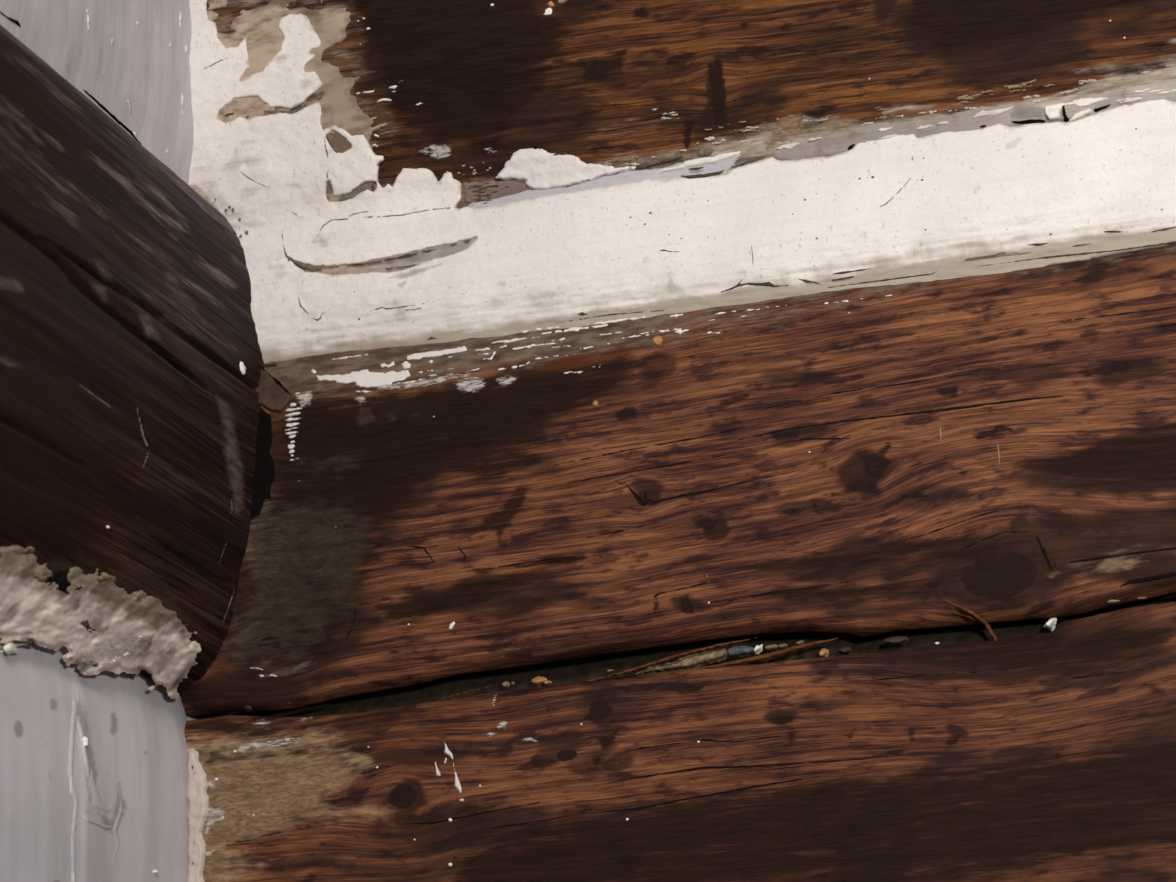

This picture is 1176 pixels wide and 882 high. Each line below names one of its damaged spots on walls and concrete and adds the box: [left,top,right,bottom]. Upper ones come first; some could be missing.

peeling [207,0,404,153]
peeling [421,145,450,159]
water stain [356,0,568,148]
peeling [446,121,760,209]
water stain [708,105,946,159]
peeling [772,64,1176,161]
water stain [996,64,1176,106]
peeling [282,234,478,275]
peeling [311,314,688,393]
water stain [254,360,638,659]
crack [218,704,331,718]
water stain [458,741,1176,882]